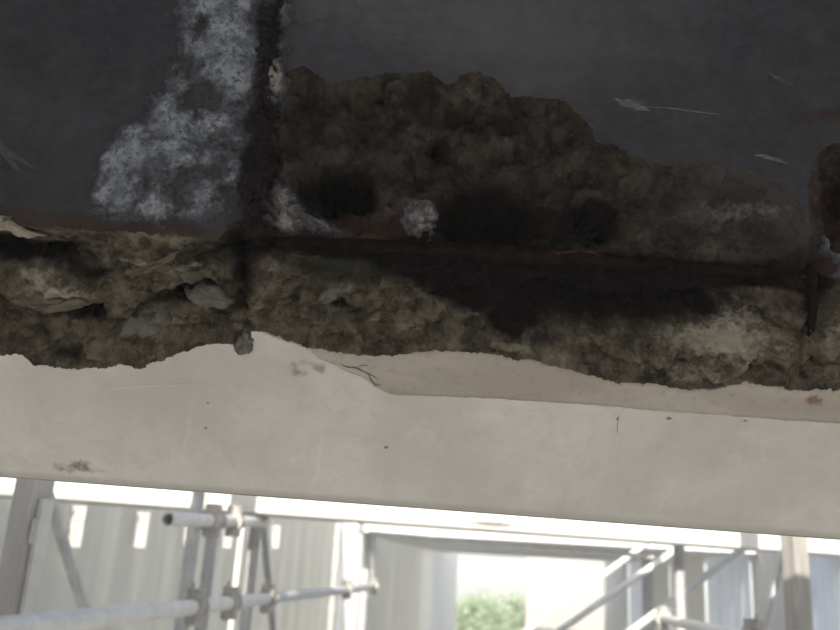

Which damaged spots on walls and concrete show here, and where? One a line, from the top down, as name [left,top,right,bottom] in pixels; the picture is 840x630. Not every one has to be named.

leakage [2,0,344,242]
spalling [0,66,840,424]
crack [340,364,377,384]